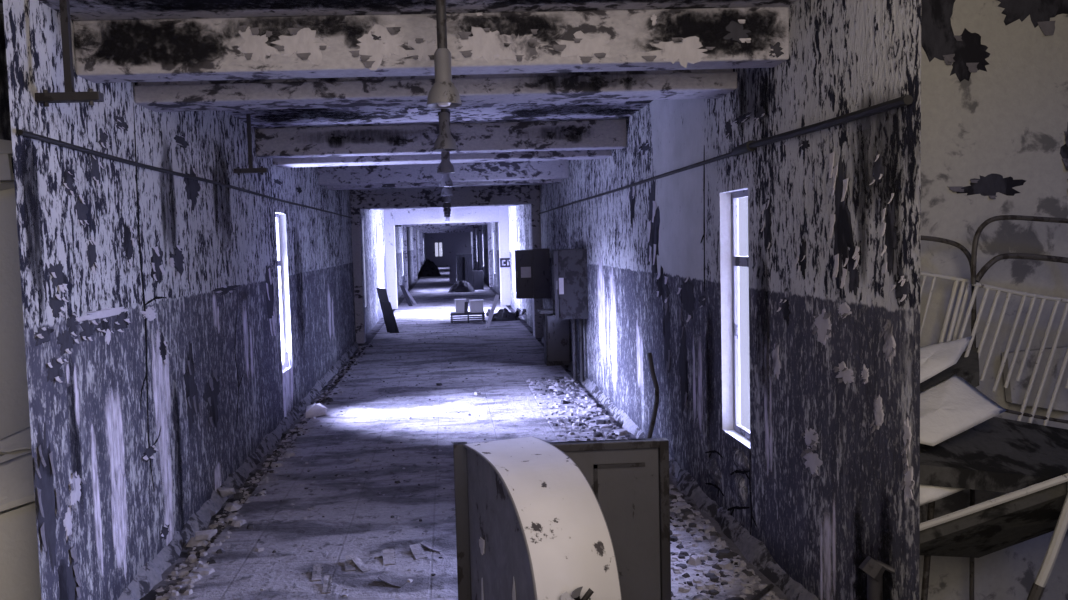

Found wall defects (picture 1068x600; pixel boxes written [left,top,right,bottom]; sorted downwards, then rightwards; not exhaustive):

peeling [236,24,330,65]
peeling [349,22,437,70]
peeling [457,12,539,63]
peeling [553,31,613,65]
peeling [640,20,751,68]
peeling [87,237,98,274]
peeling [150,245,184,288]
peeling [812,152,860,345]
peeling [881,193,910,307]
peeling [647,173,706,414]
peeling [34,260,157,383]
peeling [34,423,87,600]